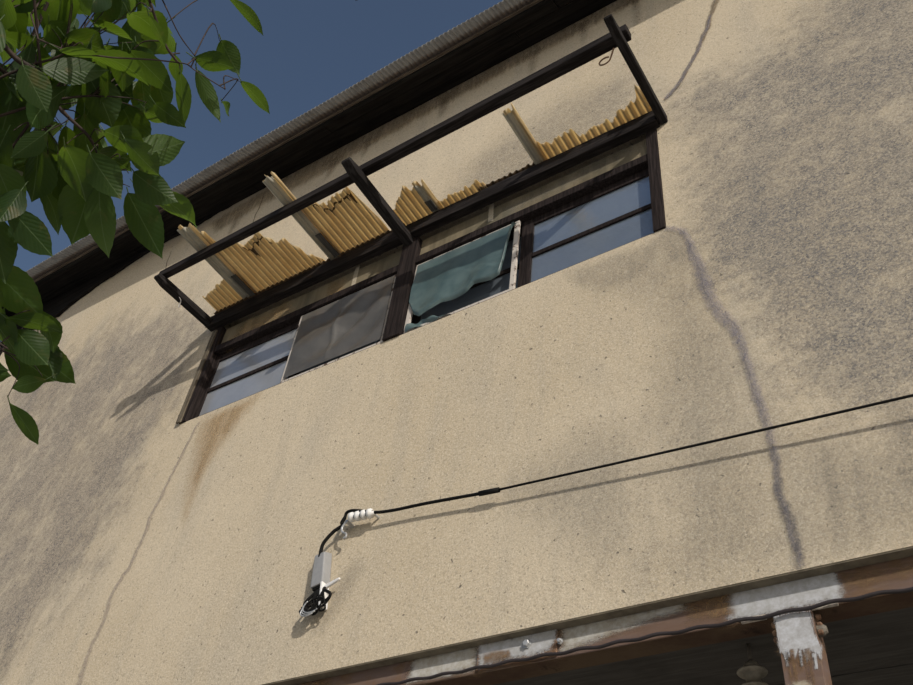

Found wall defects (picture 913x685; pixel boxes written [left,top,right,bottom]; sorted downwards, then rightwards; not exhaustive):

crack [664,0,718,99]
mould [695,0,913,397]
water stain [0,322,181,644]
peeling [408,573,844,685]
crack [668,227,801,559]